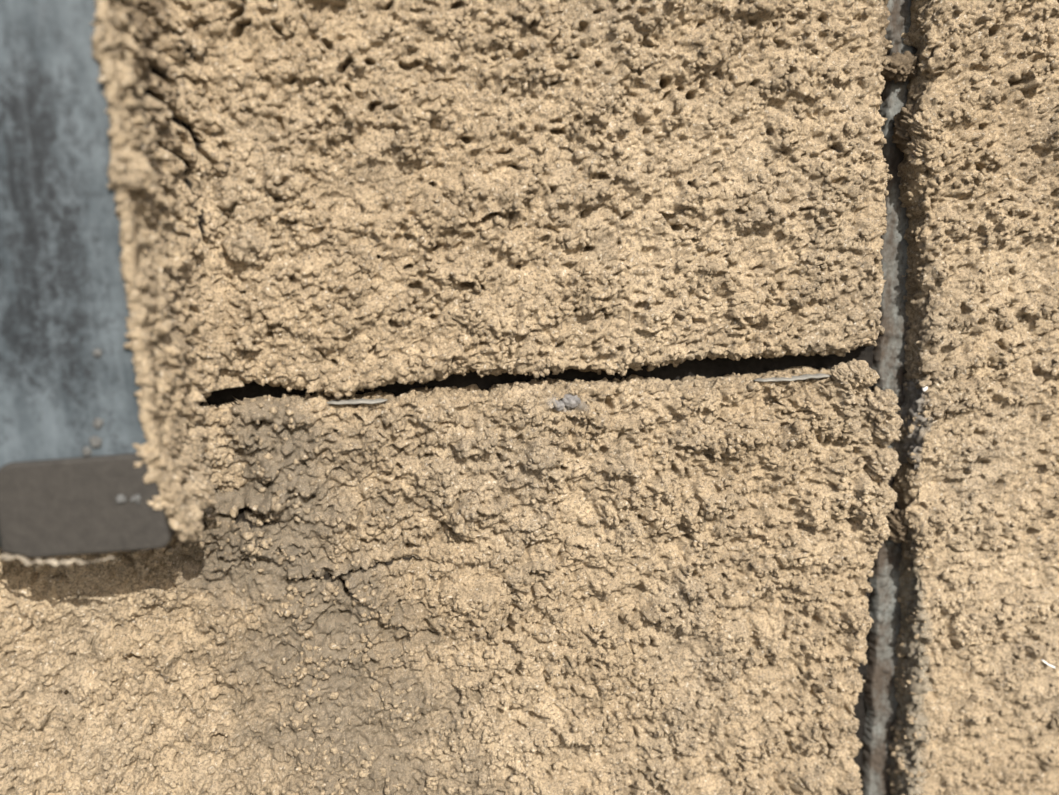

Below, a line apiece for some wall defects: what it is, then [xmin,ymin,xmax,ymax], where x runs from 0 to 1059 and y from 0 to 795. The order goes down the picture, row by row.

crack [143,66,205,237]
crack [219,507,280,529]
crack [287,556,416,591]